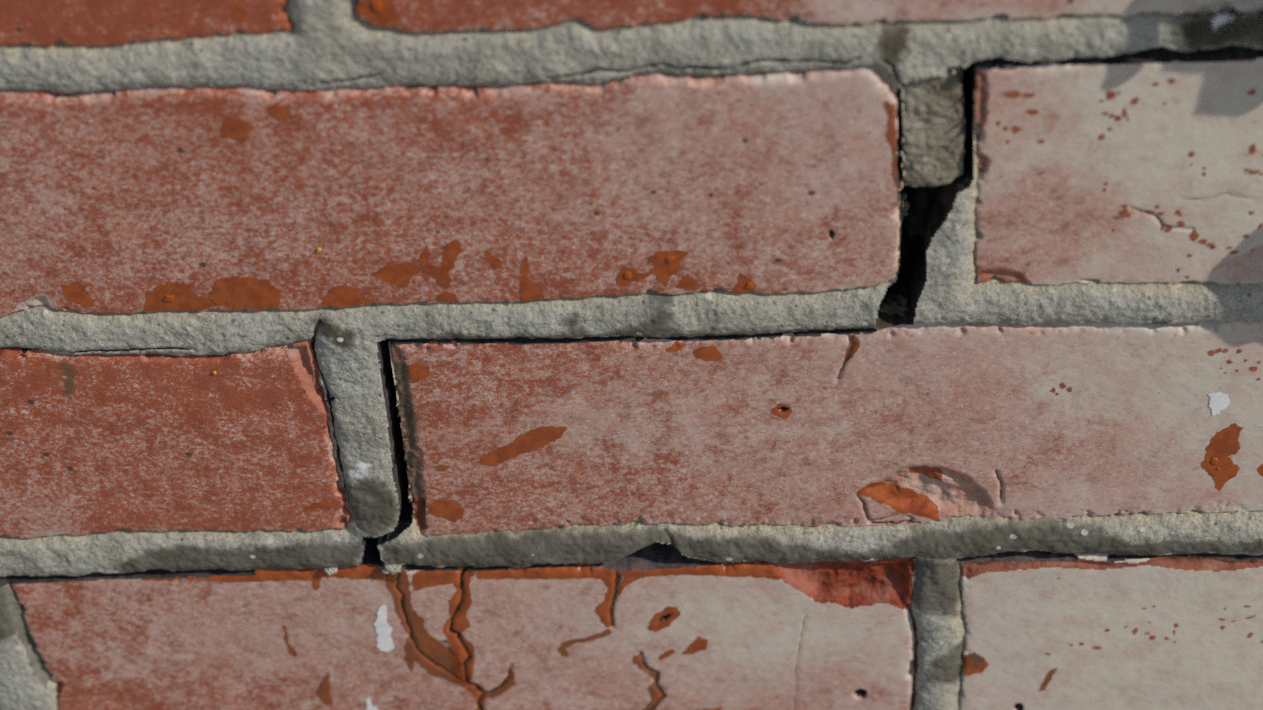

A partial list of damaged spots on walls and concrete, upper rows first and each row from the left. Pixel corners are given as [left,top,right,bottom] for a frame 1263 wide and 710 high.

water stain [1177,8,1263,51]
crack [960,44,1263,180]
water stain [845,326,869,360]
water stain [397,361,464,523]
water stain [477,426,567,466]
water stain [771,403,792,419]
water stain [1201,423,1243,490]
crack [360,328,876,710]
spalling [857,463,997,518]
water stain [121,462,1263,710]
spalling [529,542,915,610]